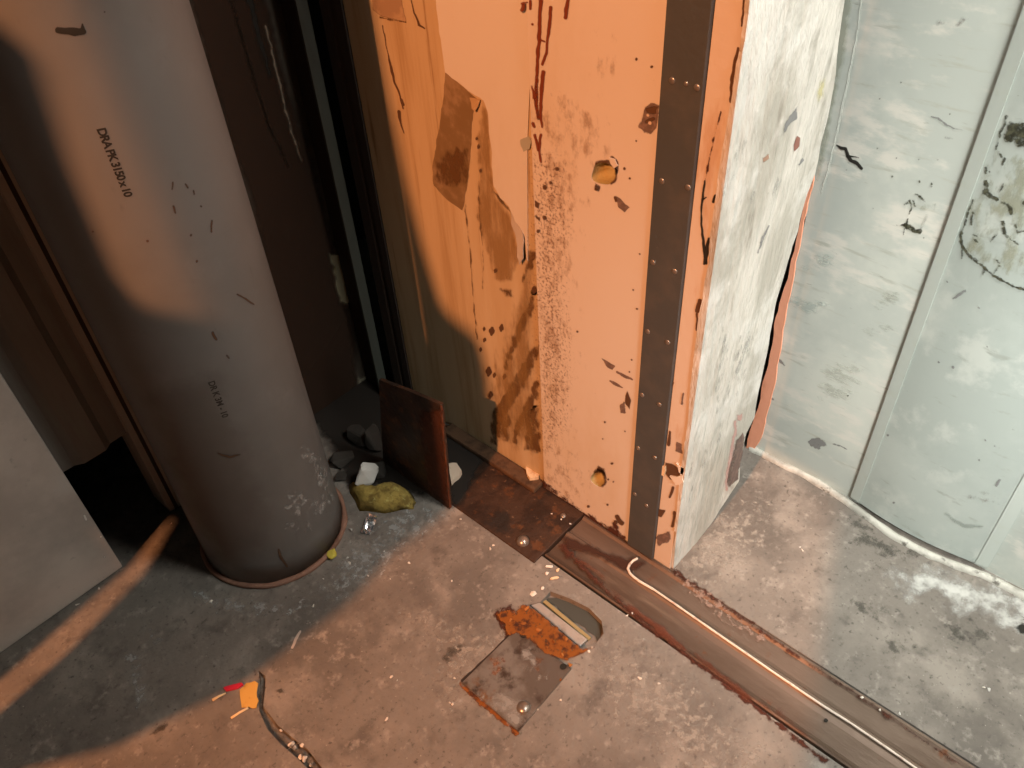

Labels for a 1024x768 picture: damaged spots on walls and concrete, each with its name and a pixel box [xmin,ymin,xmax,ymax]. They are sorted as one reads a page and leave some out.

peeling [436,0,532,280]
rust [520,0,569,163]
hole [592,156,618,191]
crack [836,145,863,170]
damp [479,165,570,452]
spalling [725,210,806,491]
hole [591,467,607,487]
rust [493,604,588,667]
rust [560,543,828,763]